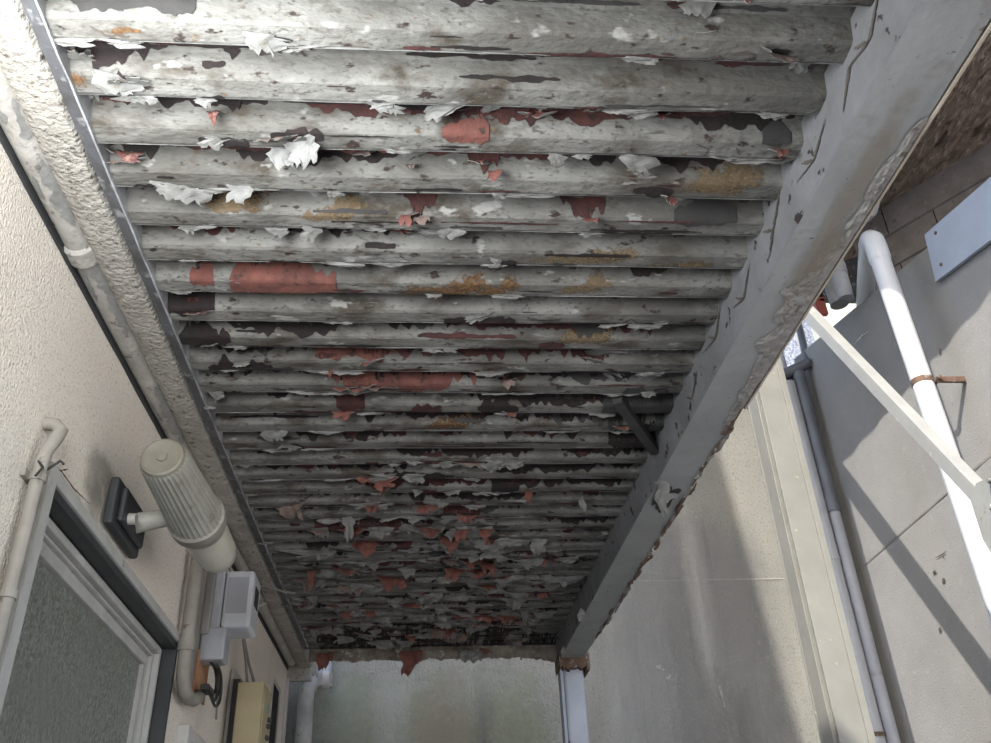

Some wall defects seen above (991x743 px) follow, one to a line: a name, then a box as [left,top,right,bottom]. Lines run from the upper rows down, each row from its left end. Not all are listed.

peeling [70,0,196,16]
peeling [667,0,787,18]
peeling [0,98,33,140]
corrosion [397,272,520,295]
peeling [161,188,676,677]
peeling [651,481,682,516]
corrosion [595,398,750,639]